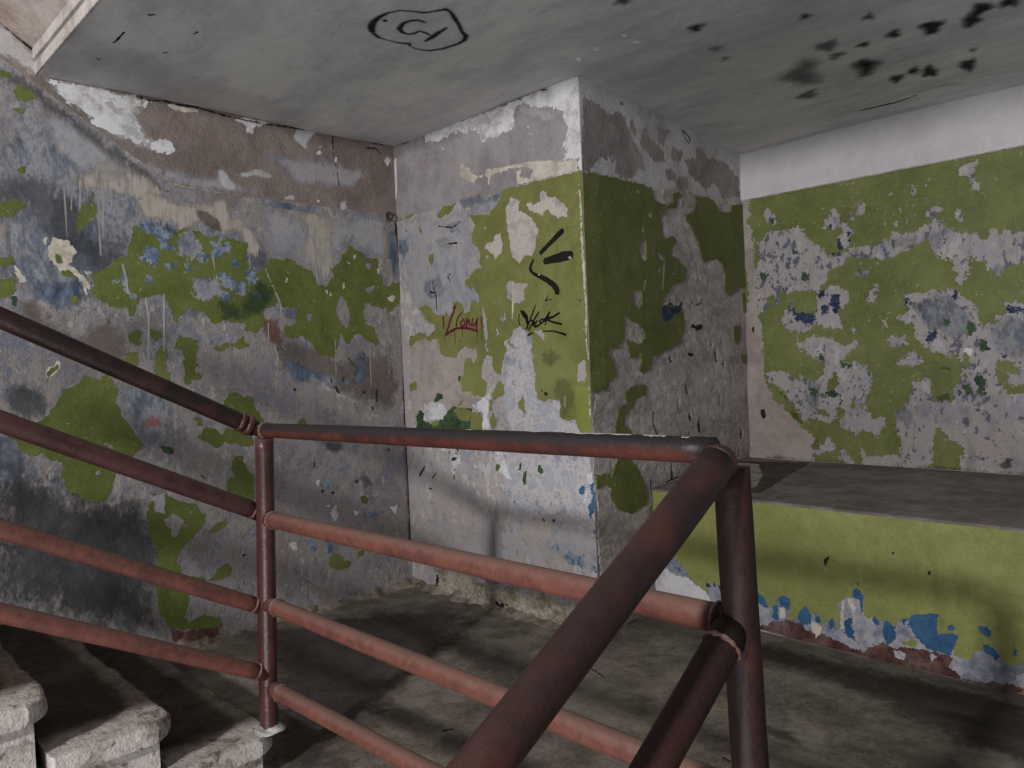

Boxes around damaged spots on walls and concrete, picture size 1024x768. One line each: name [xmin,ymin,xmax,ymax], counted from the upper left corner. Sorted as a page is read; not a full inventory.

leakage [0,77,388,324]
peeling [0,256,27,307]
peeling [37,96,1024,470]
leakage [76,322,125,358]
leakage [280,343,396,406]
peeling [8,436,115,502]
peeling [194,417,255,500]
peeling [146,493,232,581]
peeling [494,451,691,576]
peeling [656,501,720,601]
peeling [155,585,222,642]
peeling [752,502,1024,689]